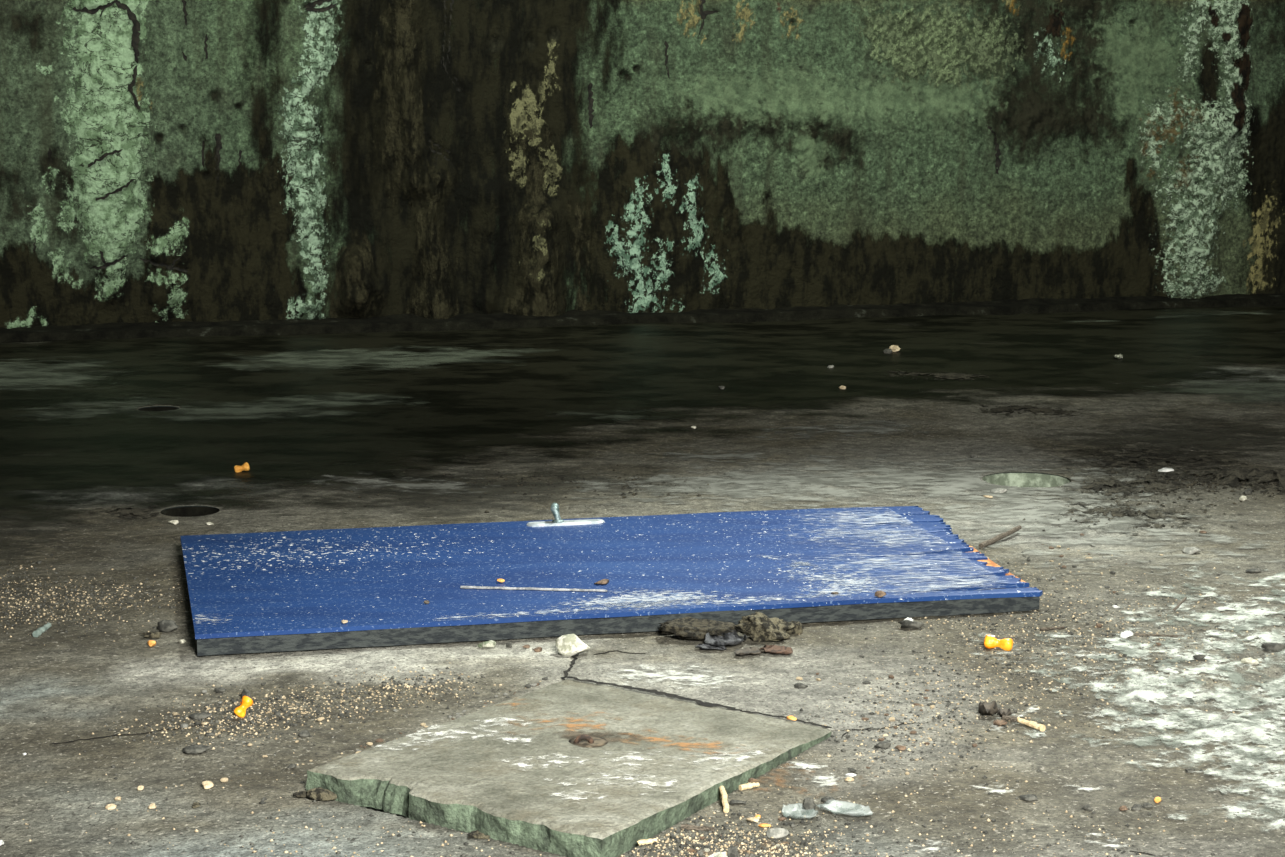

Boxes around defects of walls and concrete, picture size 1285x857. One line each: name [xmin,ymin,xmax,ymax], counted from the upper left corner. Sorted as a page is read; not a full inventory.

crack [72,0,141,109]
spalling [1203,0,1255,169]
leakage [0,0,1285,574]
crack [560,650,916,737]